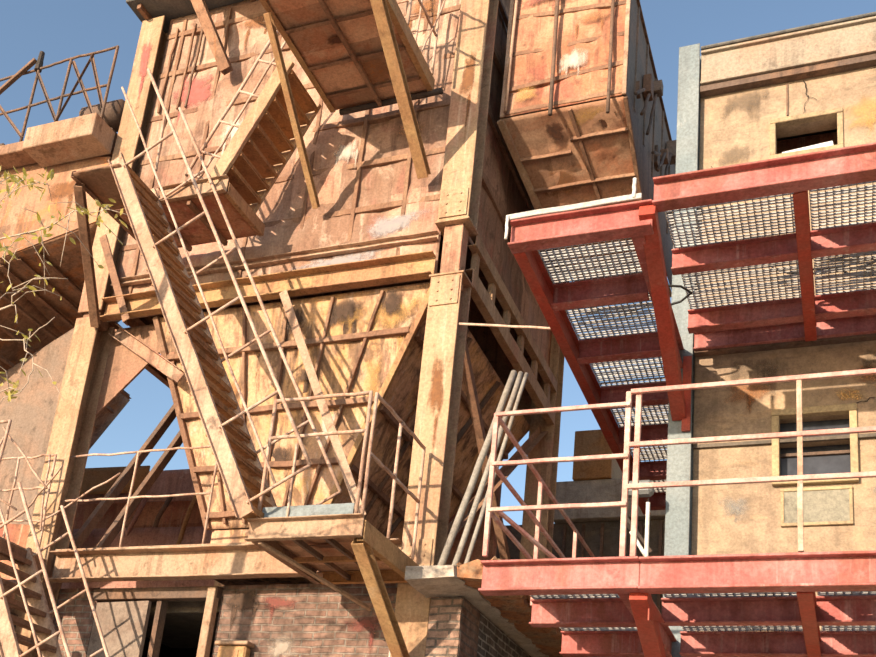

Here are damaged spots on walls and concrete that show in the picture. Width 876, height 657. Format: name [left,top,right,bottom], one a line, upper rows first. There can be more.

peeling [370,212,417,236]
leakage [382,288,401,315]
leakage [329,299,362,334]